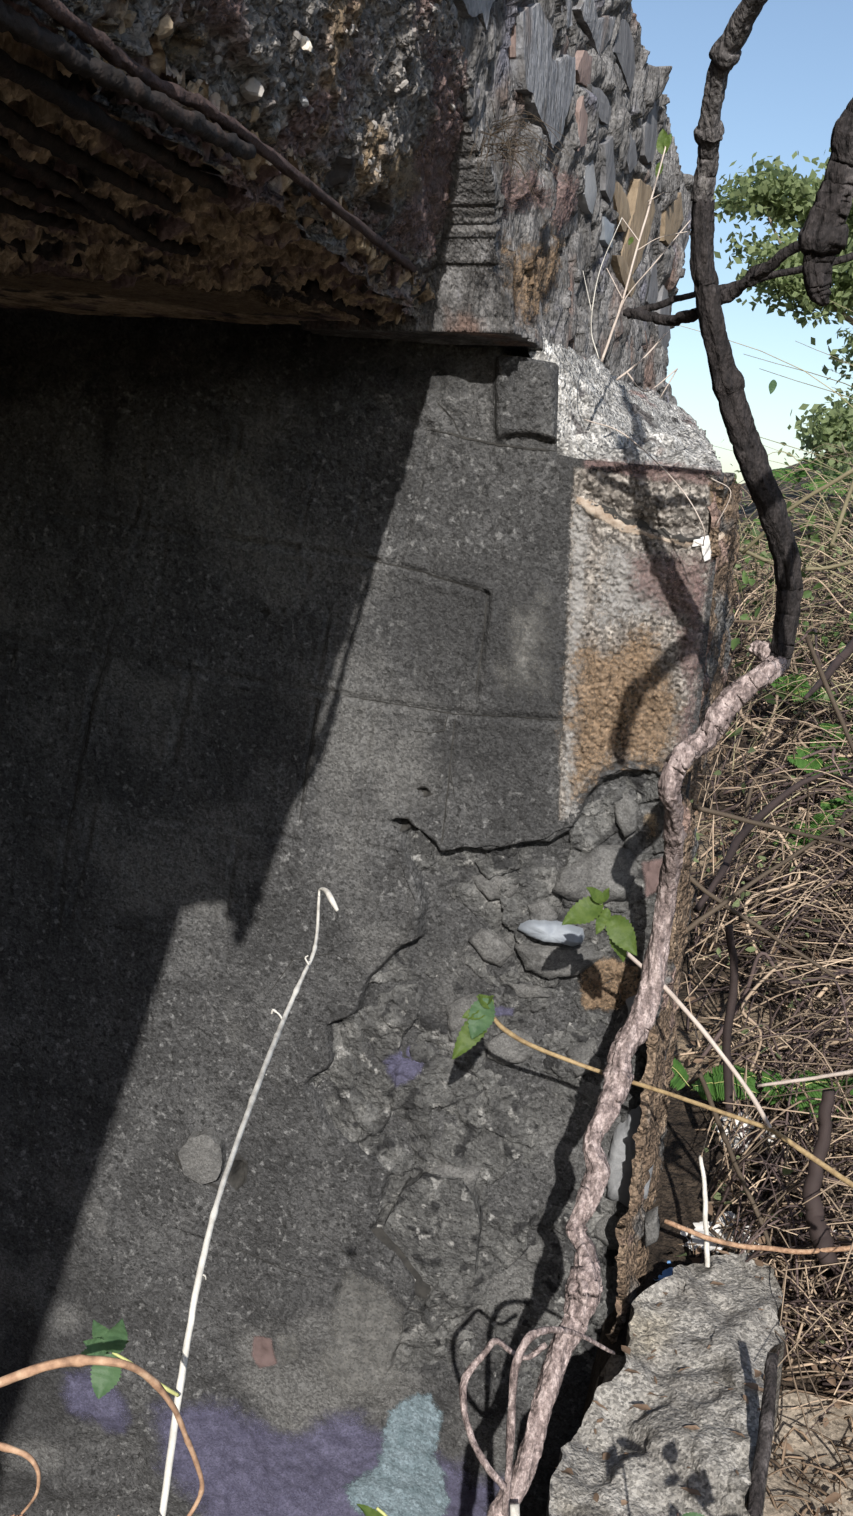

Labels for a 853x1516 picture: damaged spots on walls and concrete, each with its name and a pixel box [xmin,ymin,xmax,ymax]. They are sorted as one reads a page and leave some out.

spalling [0,0,469,326]
rust [377,37,464,261]
flaking render [309,760,665,1393]